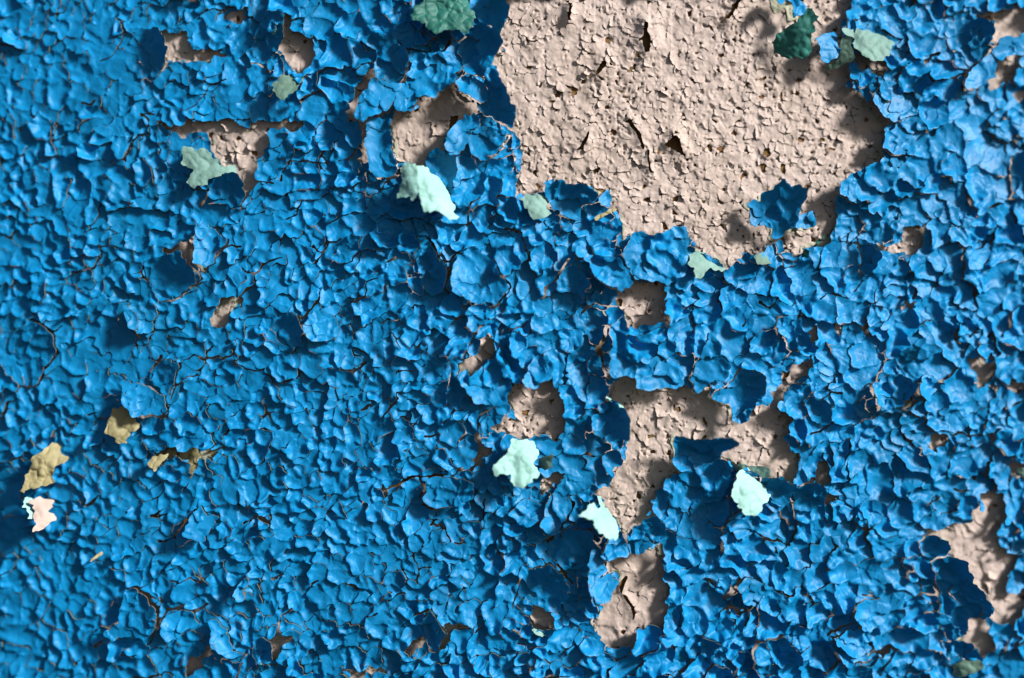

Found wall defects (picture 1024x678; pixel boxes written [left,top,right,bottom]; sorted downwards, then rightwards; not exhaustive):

crack [595,61,610,77]
crack [639,22,652,52]
crack [721,0,741,22]
crack [577,131,589,150]
crack [627,118,654,173]
crack [423,197,481,295]
crack [131,329,292,419]
crack [360,318,481,438]
peeling [140,0,955,678]
crack [382,470,466,544]
peeling [872,336,1024,678]
crack [618,576,636,619]